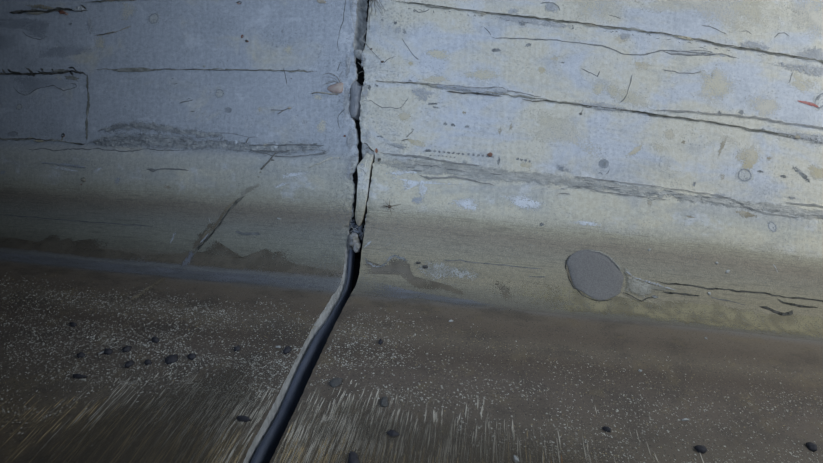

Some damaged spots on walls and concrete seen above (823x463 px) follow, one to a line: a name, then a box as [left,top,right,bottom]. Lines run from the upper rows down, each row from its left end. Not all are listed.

crack [484,25,751,74]
crack [652,280,823,316]